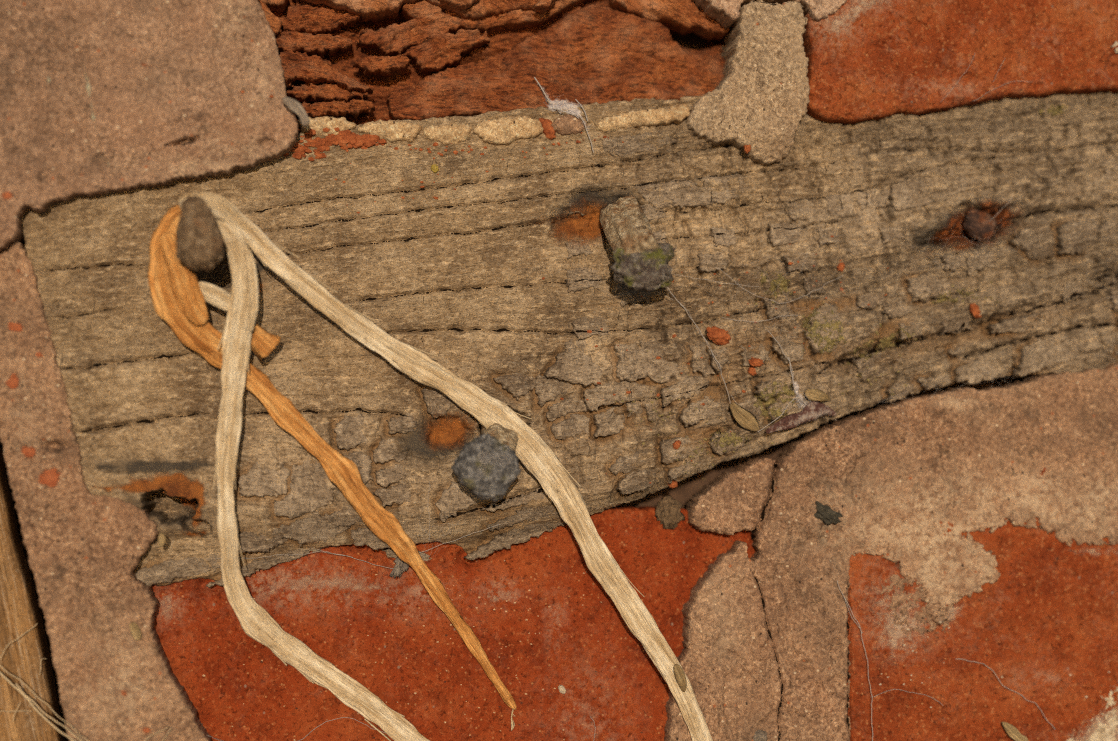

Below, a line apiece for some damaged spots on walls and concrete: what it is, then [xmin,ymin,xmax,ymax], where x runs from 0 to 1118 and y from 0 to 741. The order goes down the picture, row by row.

crack [751,463,777,540]
crack [750,569,783,741]
peeling [1100,685,1118,708]